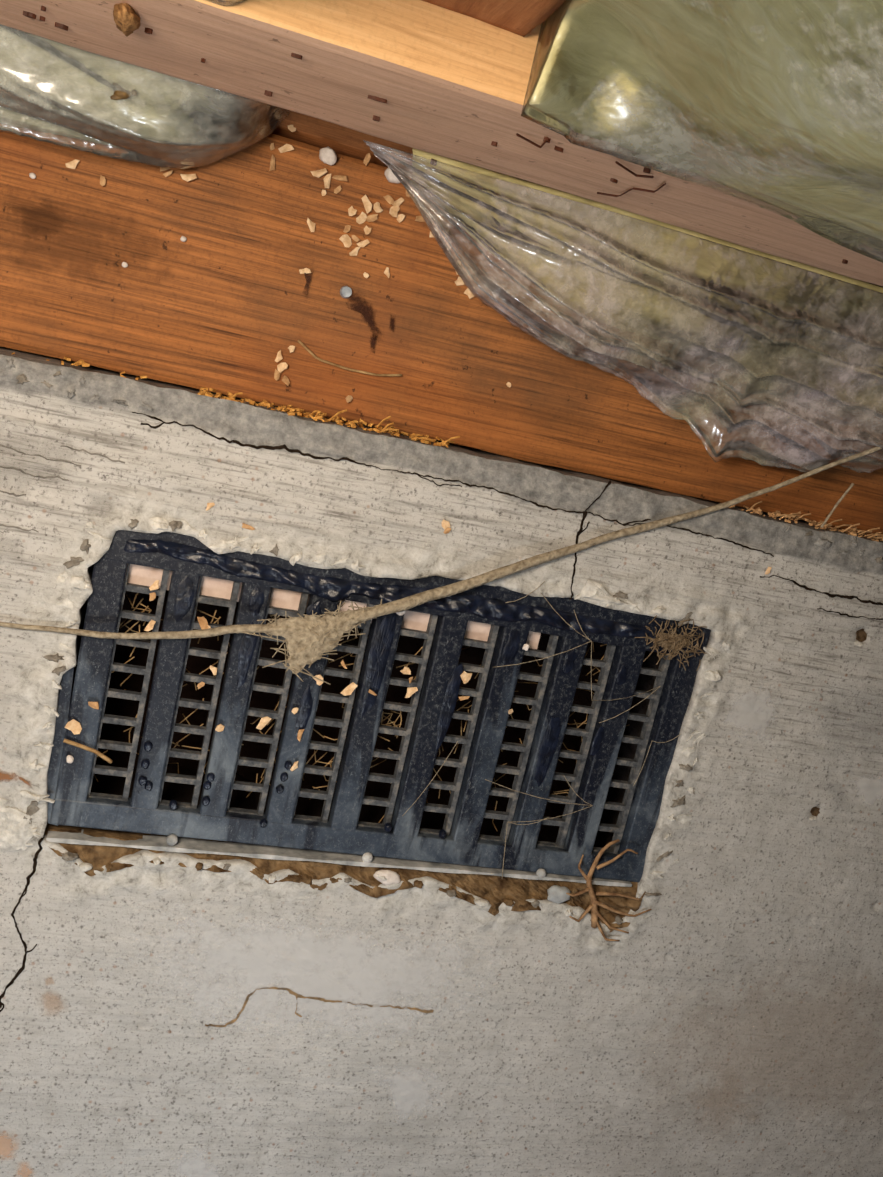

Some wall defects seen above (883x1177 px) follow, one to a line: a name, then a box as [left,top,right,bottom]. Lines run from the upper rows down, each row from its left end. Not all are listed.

crack [132,412,883,620]
crack [0,837,44,1012]